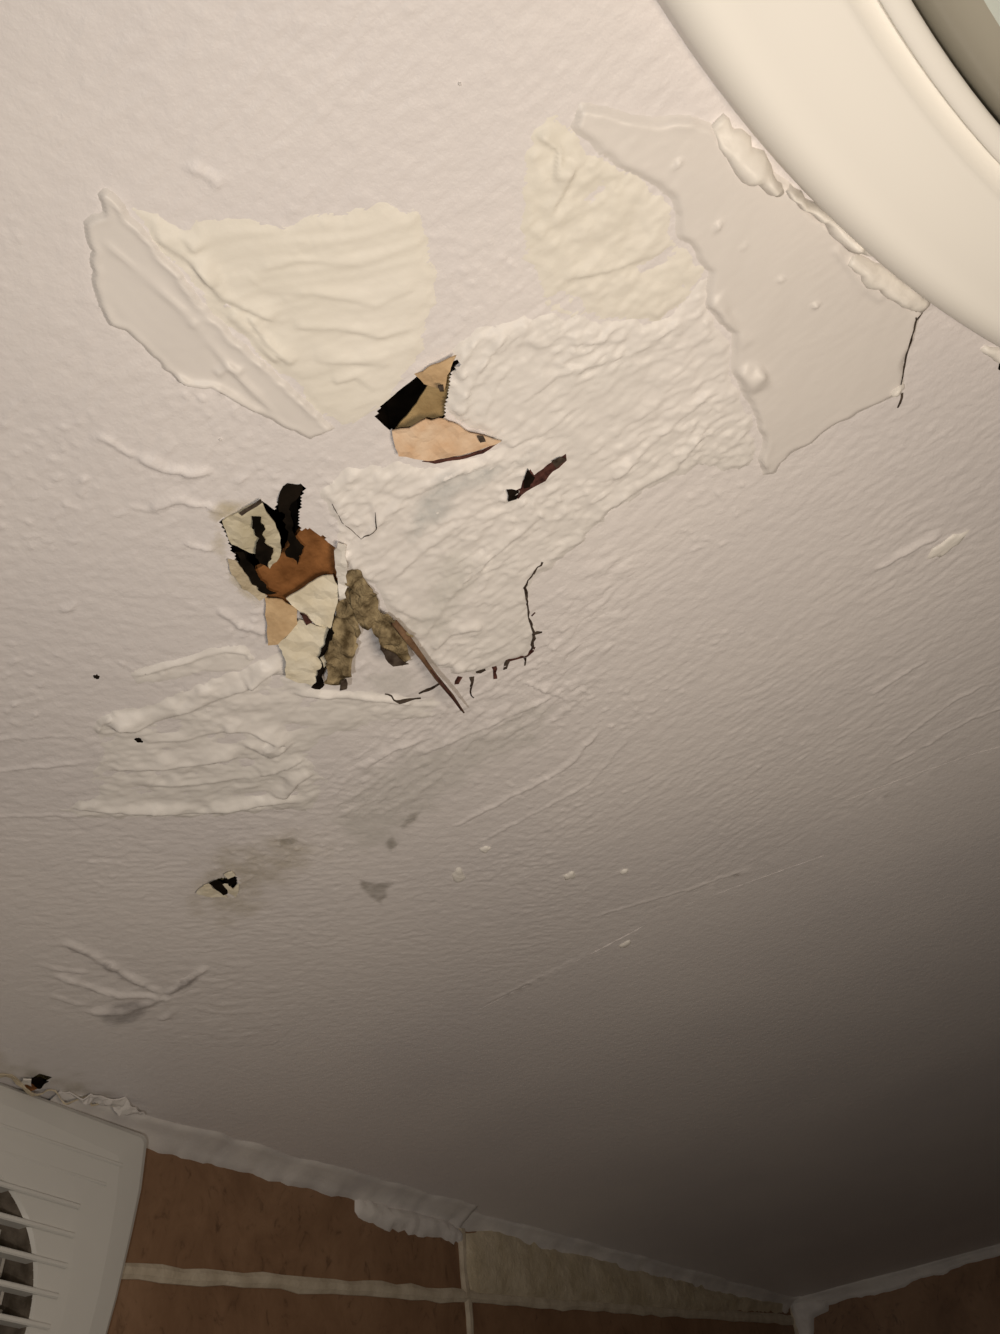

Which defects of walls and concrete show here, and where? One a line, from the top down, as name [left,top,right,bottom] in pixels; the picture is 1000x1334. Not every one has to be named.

spalling [375,355,501,464]
crack [890,311,922,408]
crack [332,504,377,539]
spalling [219,483,465,713]
crack [385,562,543,704]